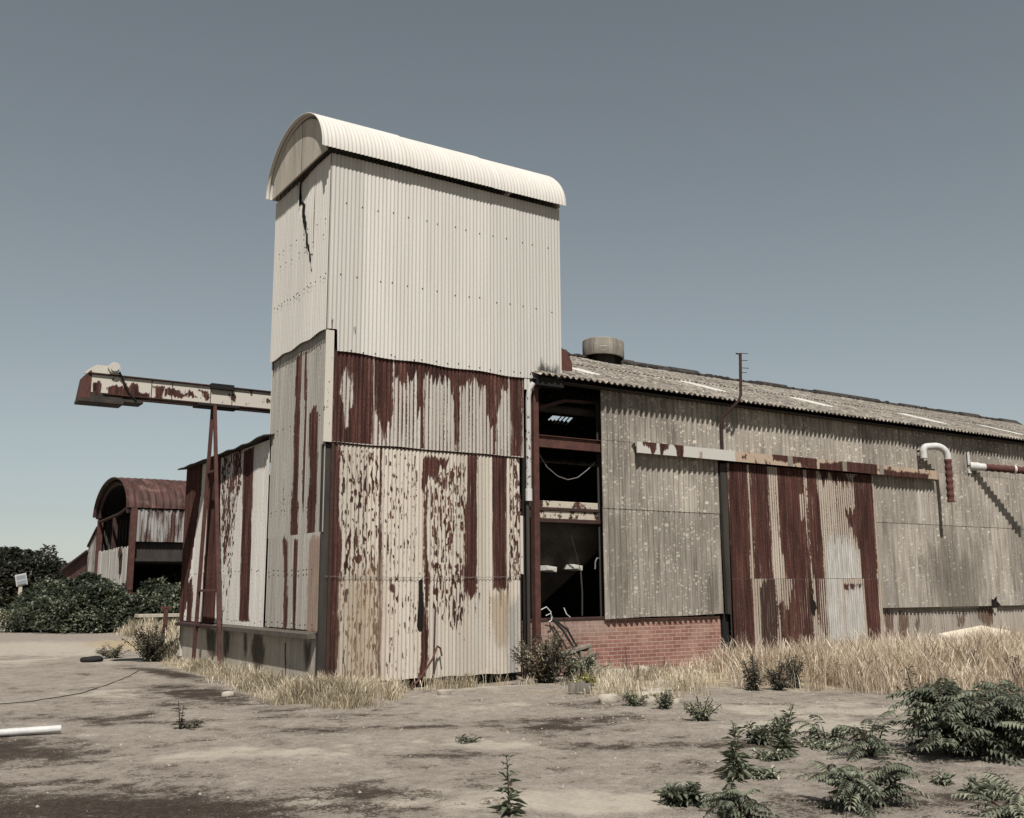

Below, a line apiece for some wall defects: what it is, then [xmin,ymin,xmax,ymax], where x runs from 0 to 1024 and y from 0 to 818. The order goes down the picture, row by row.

crack [297,183,313,271]
corrosion [93,380,210,401]
corrosion [179,447,254,624]
corrosion [282,350,523,679]
corrosion [643,442,684,457]
corrosion [727,454,929,658]